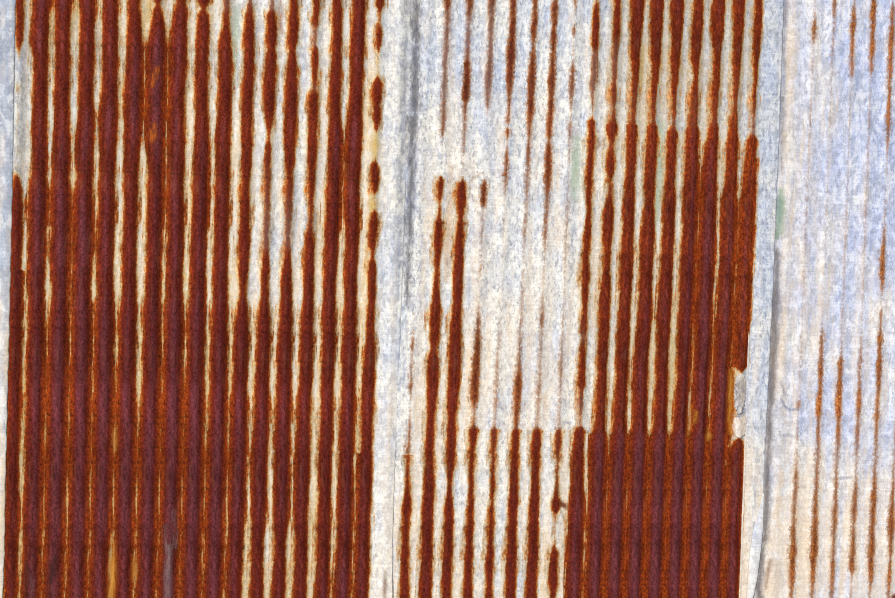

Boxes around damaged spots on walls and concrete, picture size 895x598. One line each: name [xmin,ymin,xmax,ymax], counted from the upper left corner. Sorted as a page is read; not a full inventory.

rust [869,0,877,73]
rust [885,3,895,147]
rust [3,0,389,598]
rust [396,0,764,598]
rust [878,229,886,289]
rust [787,468,799,598]
rust [809,331,825,598]
rust [829,356,844,598]
rust [849,476,858,576]
rust [867,309,884,592]
rust [886,469,895,598]